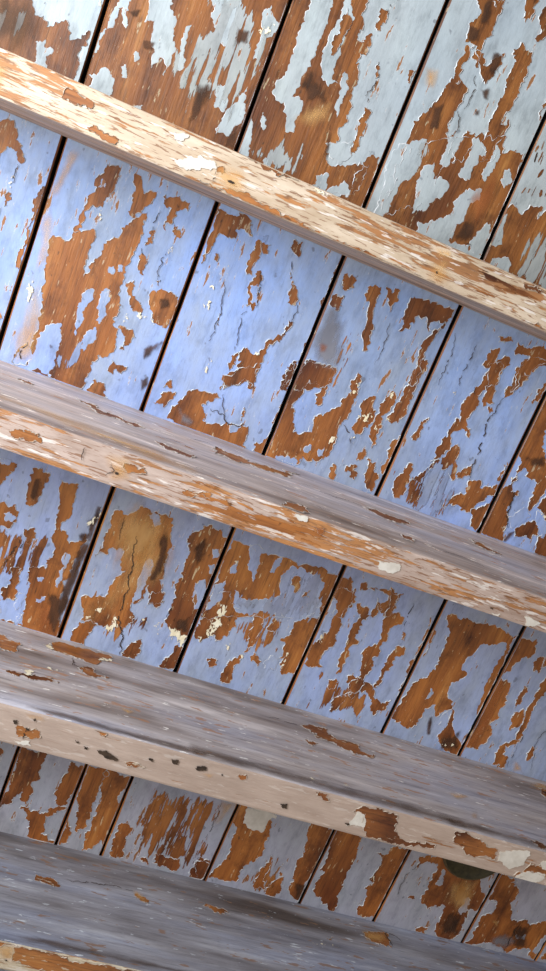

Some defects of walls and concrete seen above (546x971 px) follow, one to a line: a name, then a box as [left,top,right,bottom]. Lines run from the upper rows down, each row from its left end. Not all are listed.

peeling [0,0,546,312]
peeling [0,458,17,485]
peeling [9,429,42,443]
peeling [12,164,190,429]
peeling [123,462,147,474]
peeling [153,239,546,557]
peeling [0,467,546,769]
peeling [0,942,135,971]
peeling [0,724,546,960]